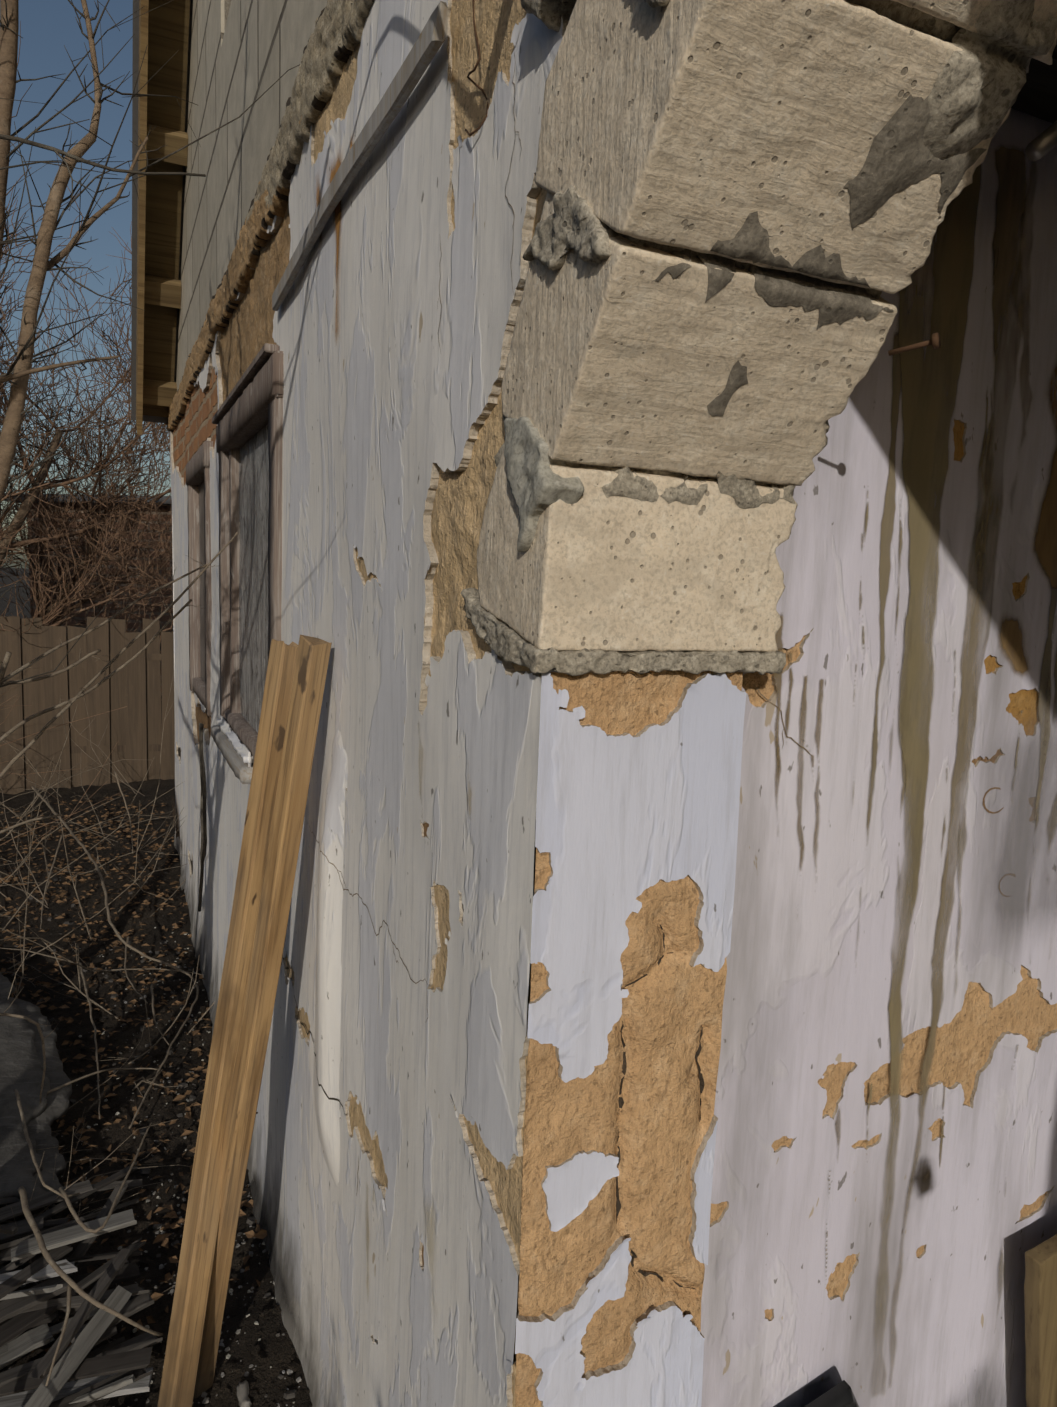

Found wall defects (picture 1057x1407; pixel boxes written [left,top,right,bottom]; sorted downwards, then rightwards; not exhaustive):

peeling [446,0,527,239]
spalling [562,14,571,38]
spalling [418,173,813,737]
peeling [953,419,967,462]
damp [774,615,824,867]
damp [862,146,1057,1204]
crack [308,823,428,1023]
peeling [427,880,463,993]
peeling [339,1091,388,1213]
spalling [450,875,729,1391]
peeling [818,965,1057,1120]
spalling [506,1353,543,1407]